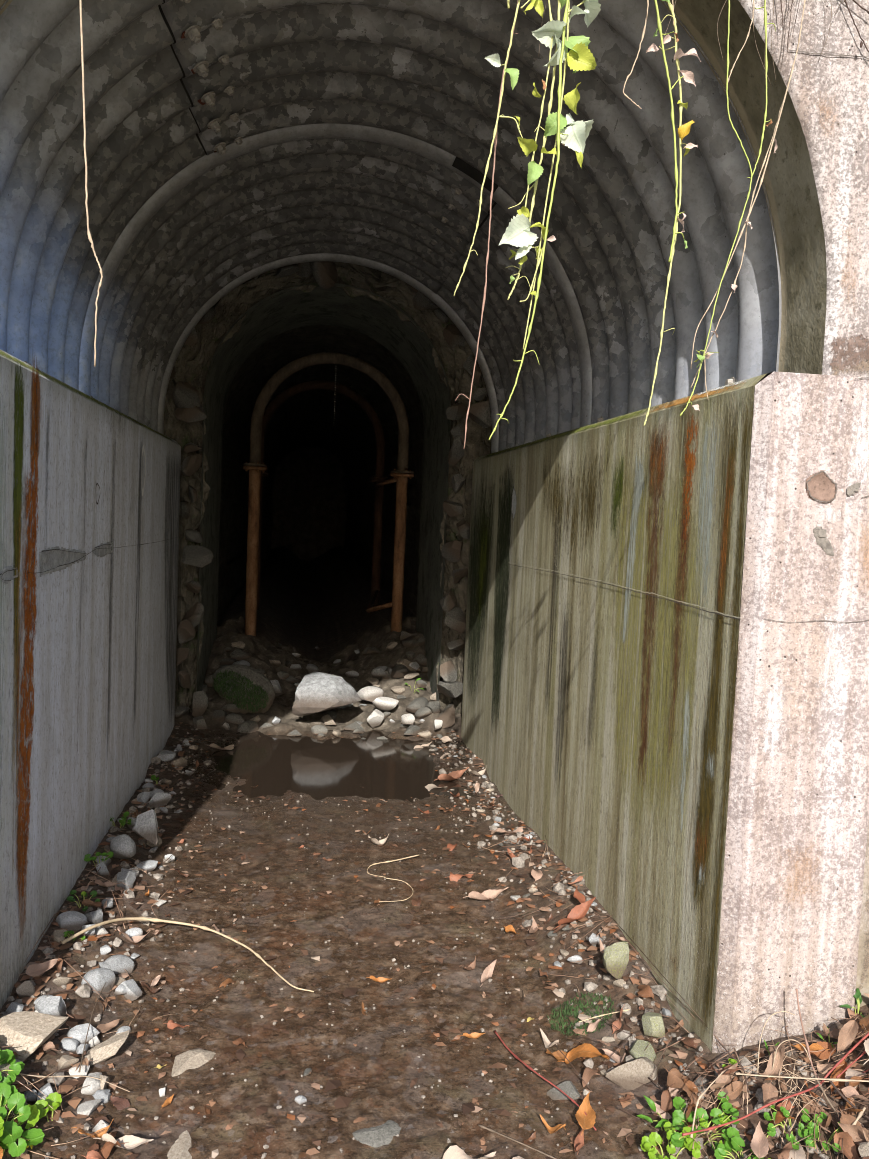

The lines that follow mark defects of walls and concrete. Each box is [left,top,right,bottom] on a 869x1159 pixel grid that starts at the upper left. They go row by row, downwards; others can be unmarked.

water stain [830,335,869,376]
rust [16,360,40,931]
crack [0,538,172,581]
water stain [491,468,513,725]
water stain [545,526,570,779]
rust [638,432,670,784]
rust [669,415,698,756]
crack [508,552,869,626]
rust [692,404,740,910]
water stain [702,408,754,1028]
spalling [813,526,834,556]
spalling [805,470,861,503]